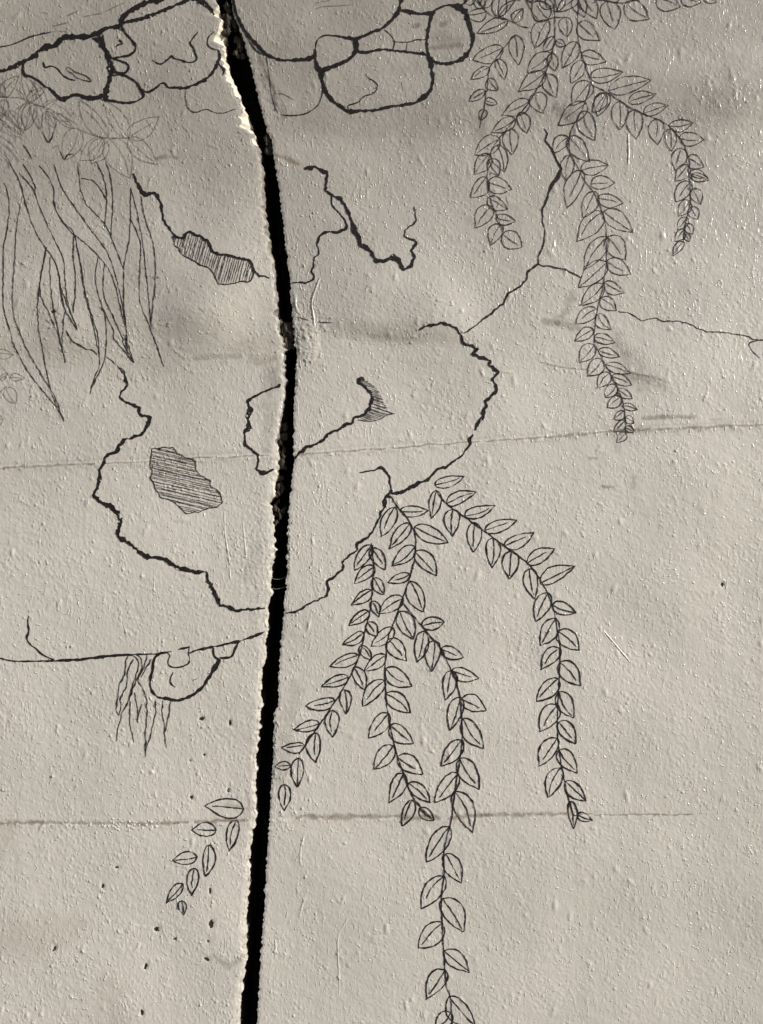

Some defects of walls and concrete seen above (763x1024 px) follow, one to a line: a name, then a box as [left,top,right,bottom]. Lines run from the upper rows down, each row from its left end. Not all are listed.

crack [618,311,763,358]
crack [531,425,751,443]
crack [69,0,581,1024]